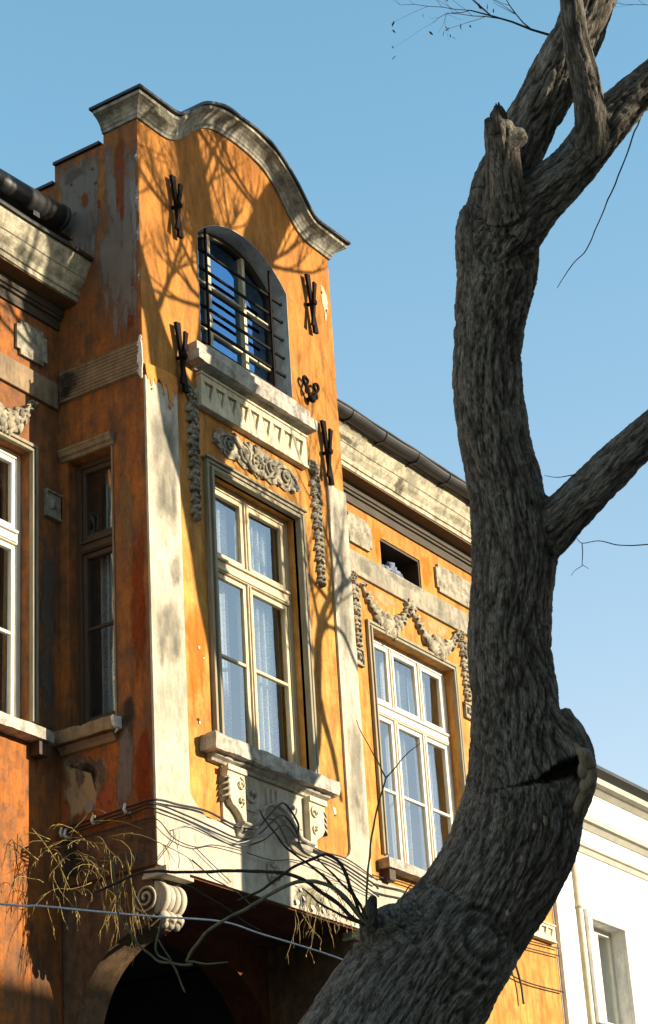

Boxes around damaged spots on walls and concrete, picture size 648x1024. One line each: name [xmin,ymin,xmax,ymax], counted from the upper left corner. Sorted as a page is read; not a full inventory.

peeling [137,334,178,410]
peeling [64,758,110,820]